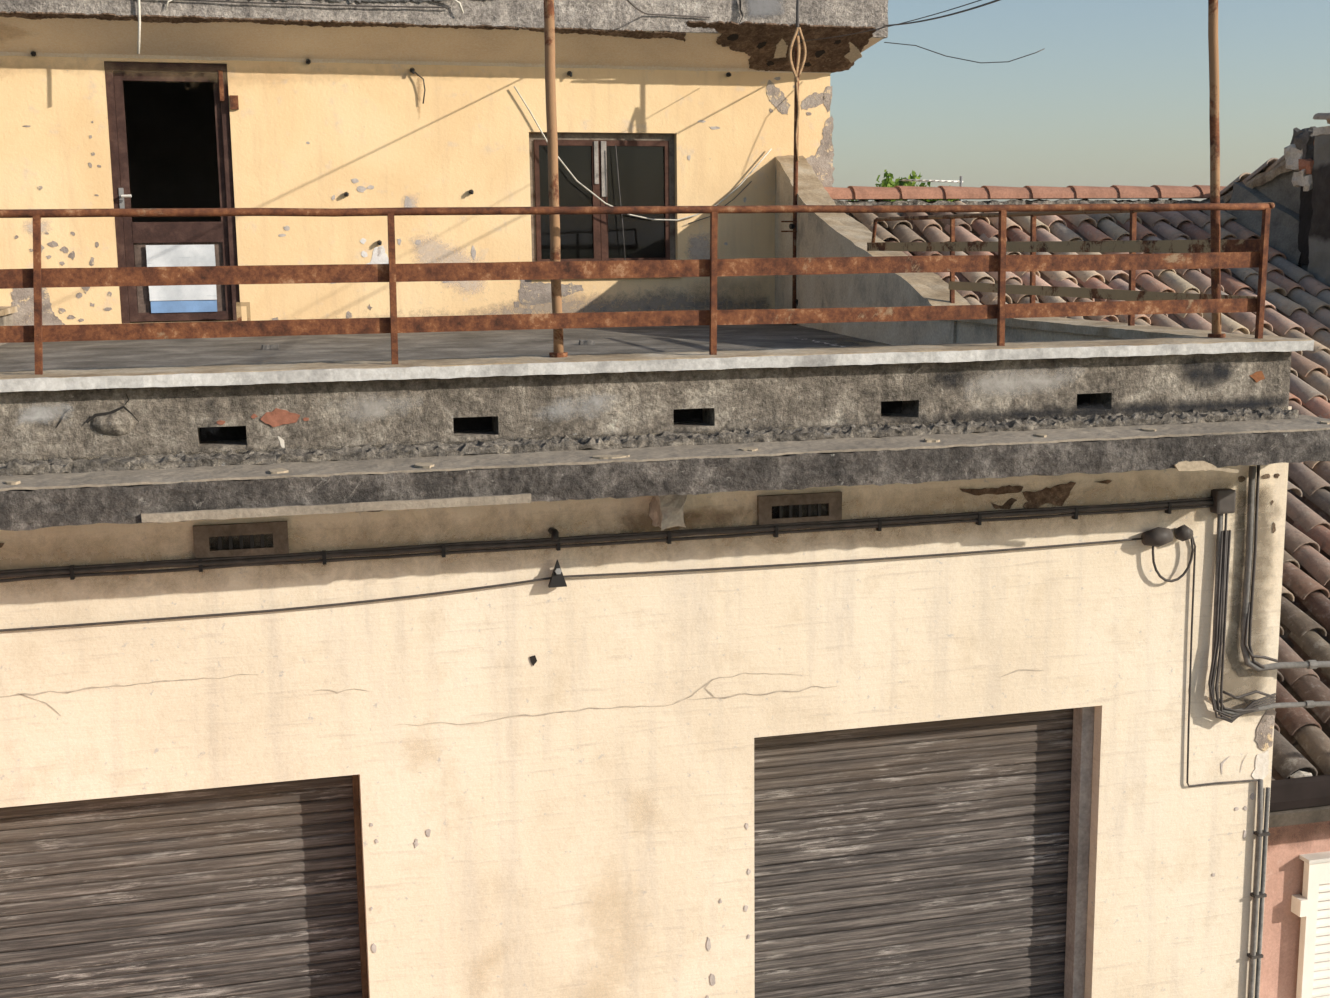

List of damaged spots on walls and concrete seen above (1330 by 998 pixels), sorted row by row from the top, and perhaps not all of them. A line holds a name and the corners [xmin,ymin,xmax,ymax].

spalling [0,11,876,187]
peeling [15,223,99,266]
spalling [11,287,112,326]
spalling [960,481,1076,509]
crack [399,673,836,726]